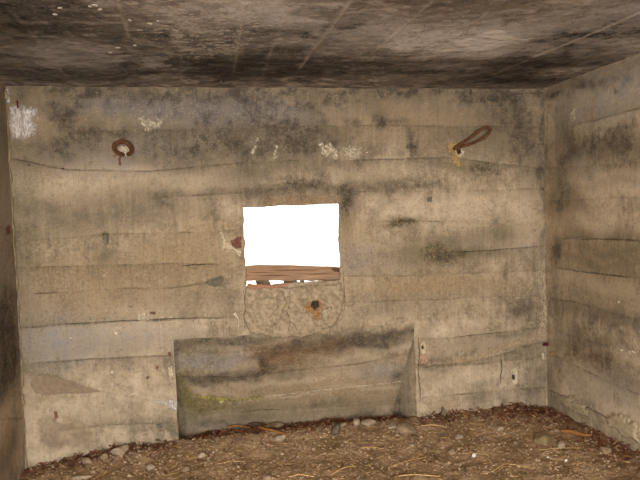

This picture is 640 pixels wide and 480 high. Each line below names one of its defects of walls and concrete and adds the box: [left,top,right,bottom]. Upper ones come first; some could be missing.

water stain [18,36,171,68]
water stain [128,0,288,62]
water stain [424,30,535,53]
water stain [9,99,37,138]
spalling [219,231,241,257]
corrosion [305,300,325,320]